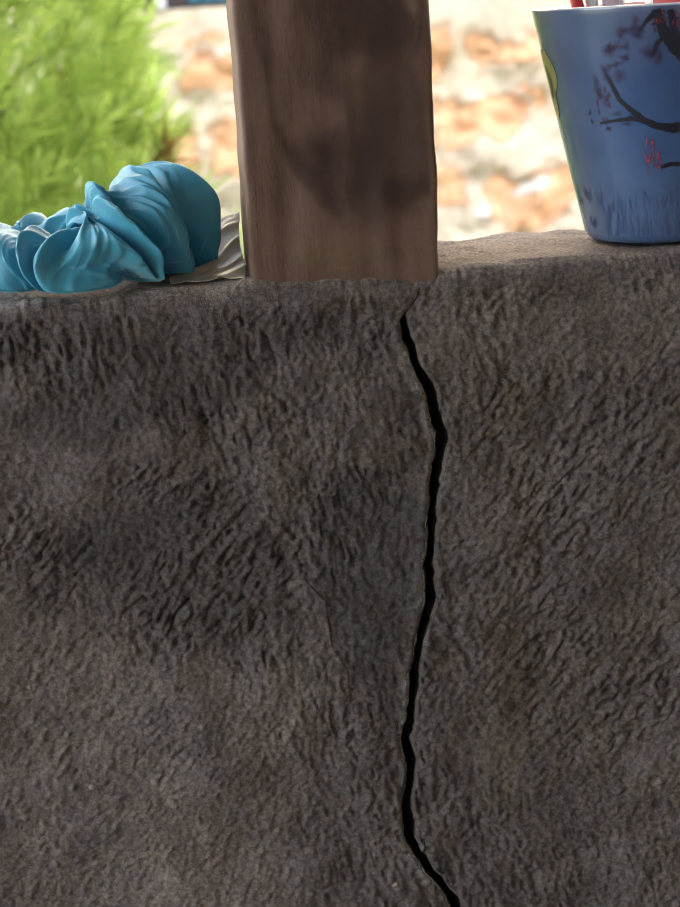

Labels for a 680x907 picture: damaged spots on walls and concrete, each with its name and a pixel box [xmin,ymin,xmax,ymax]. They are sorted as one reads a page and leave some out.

crack [396,291,461,907]